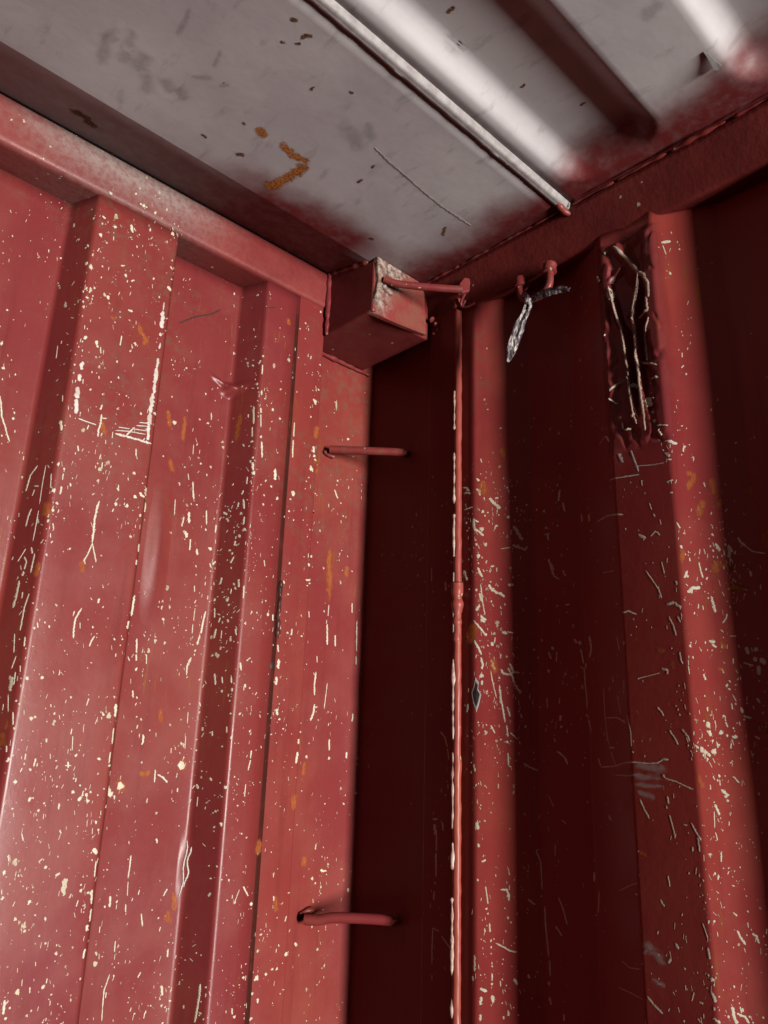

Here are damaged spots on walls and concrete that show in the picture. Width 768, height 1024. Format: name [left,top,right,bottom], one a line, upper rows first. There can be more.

corrosion [264,143,309,190]
peeling [606,375,694,540]
peeling [0,192,191,962]
peeling [154,328,321,839]
peeling [284,657,354,781]
peeling [445,452,545,830]
peeling [618,482,768,1024]
peeling [2,934,297,1024]
peeling [472,844,565,1021]